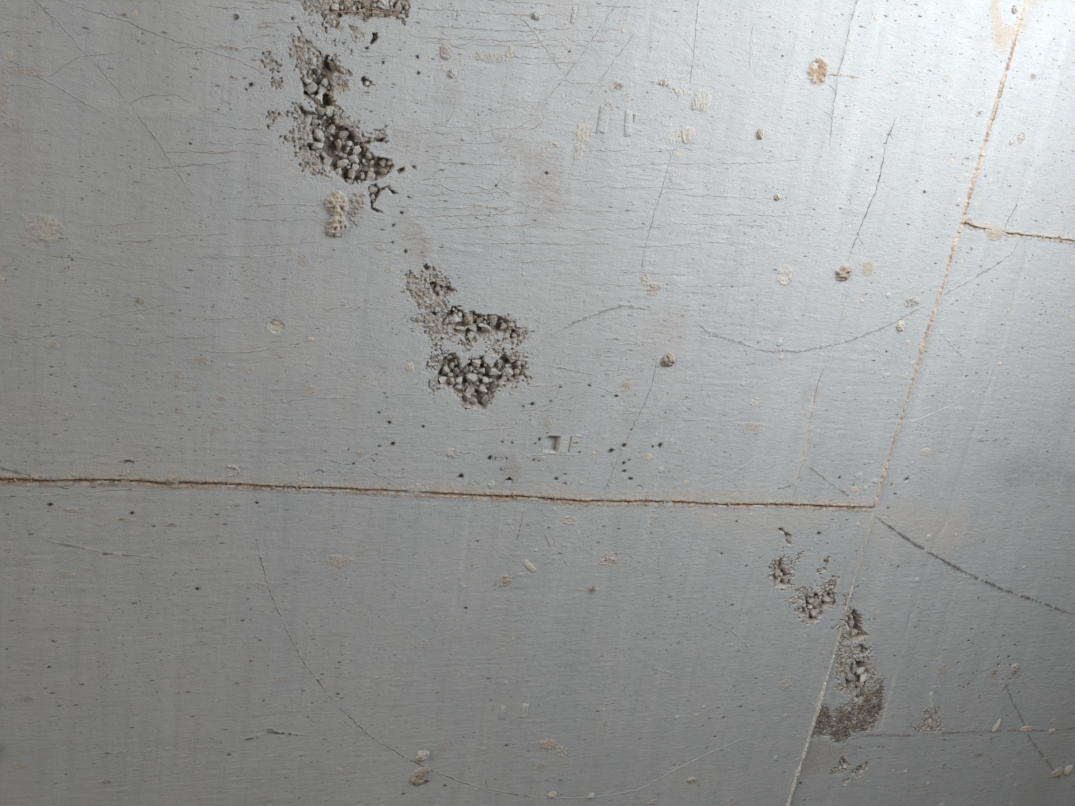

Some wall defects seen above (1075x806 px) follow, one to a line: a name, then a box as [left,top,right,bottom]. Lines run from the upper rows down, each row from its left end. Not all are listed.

crack [0,0,298,196]
crack [363,0,644,87]
crack [679,0,699,82]
crack [825,0,859,144]
crack [49,202,325,266]
crack [357,108,826,287]
crack [848,118,896,261]
crack [603,341,706,494]
crack [244,539,537,797]